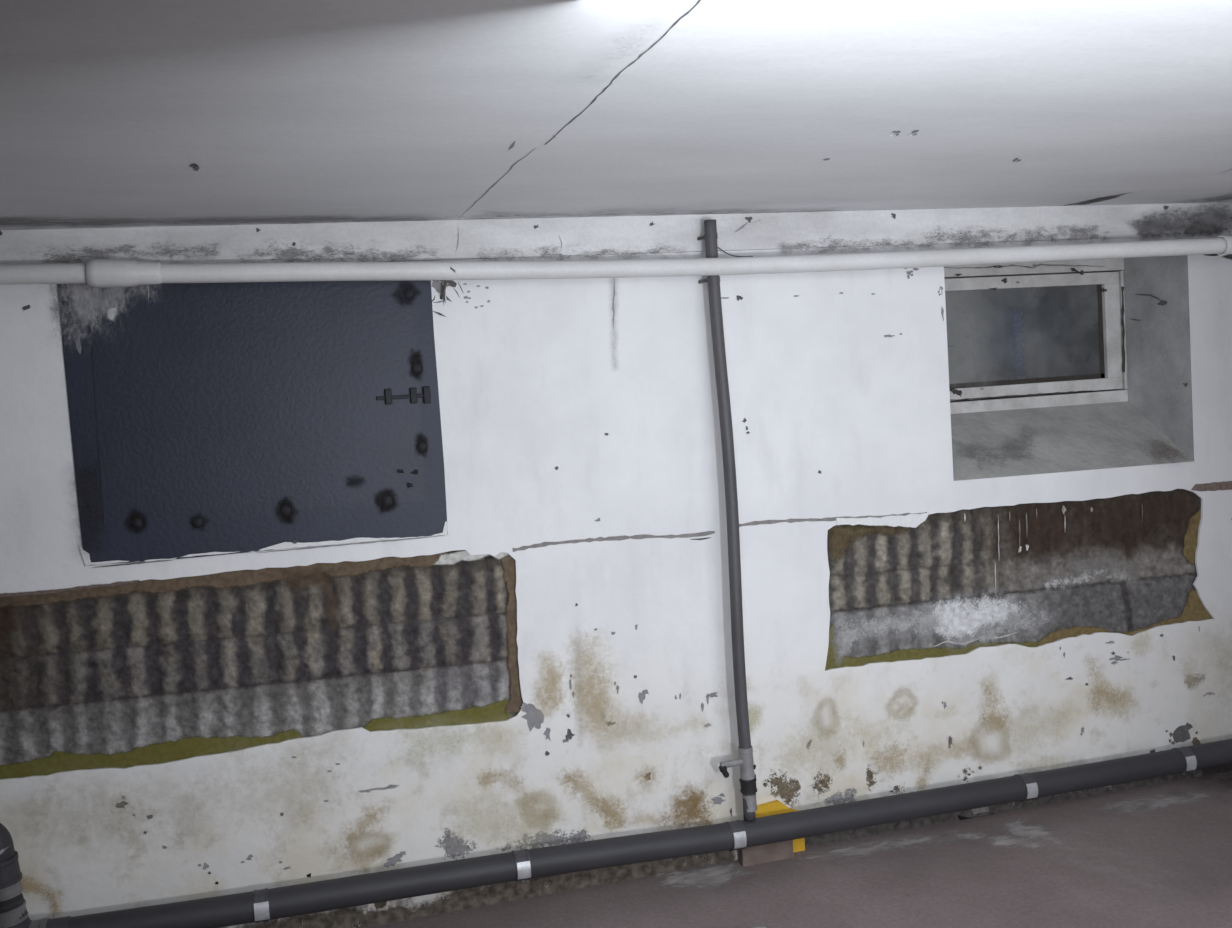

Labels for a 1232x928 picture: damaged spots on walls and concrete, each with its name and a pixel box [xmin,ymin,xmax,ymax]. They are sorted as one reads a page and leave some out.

crack [456,0,701,250]
leakage [1132,205,1232,239]
flaking render [0,550,574,779]
flaking render [825,489,1213,670]
leakage [763,753,905,806]
flaking render [244,850,735,928]